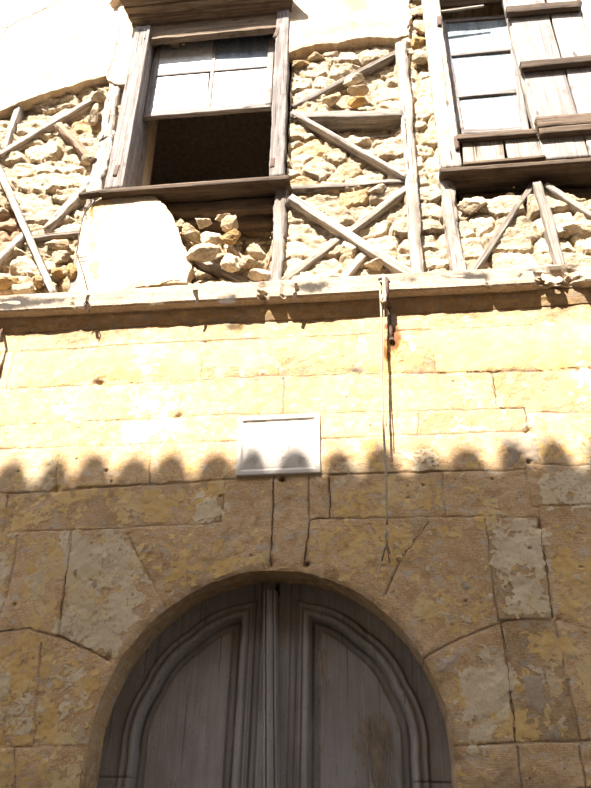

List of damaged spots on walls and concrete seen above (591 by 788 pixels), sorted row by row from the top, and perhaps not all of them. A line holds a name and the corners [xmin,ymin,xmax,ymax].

spalling [115,3,129,19]
spalling [441,4,505,19]
spalling [0,84,115,296]
peeling [129,197,167,213]
spalling [138,213,273,288]
spalling [282,0,449,280]
spalling [455,190,591,284]
peeling [0,315,591,512]
peeling [0,417,270,788]
peeling [325,437,443,581]
peeling [460,481,553,619]
peeling [436,629,591,758]